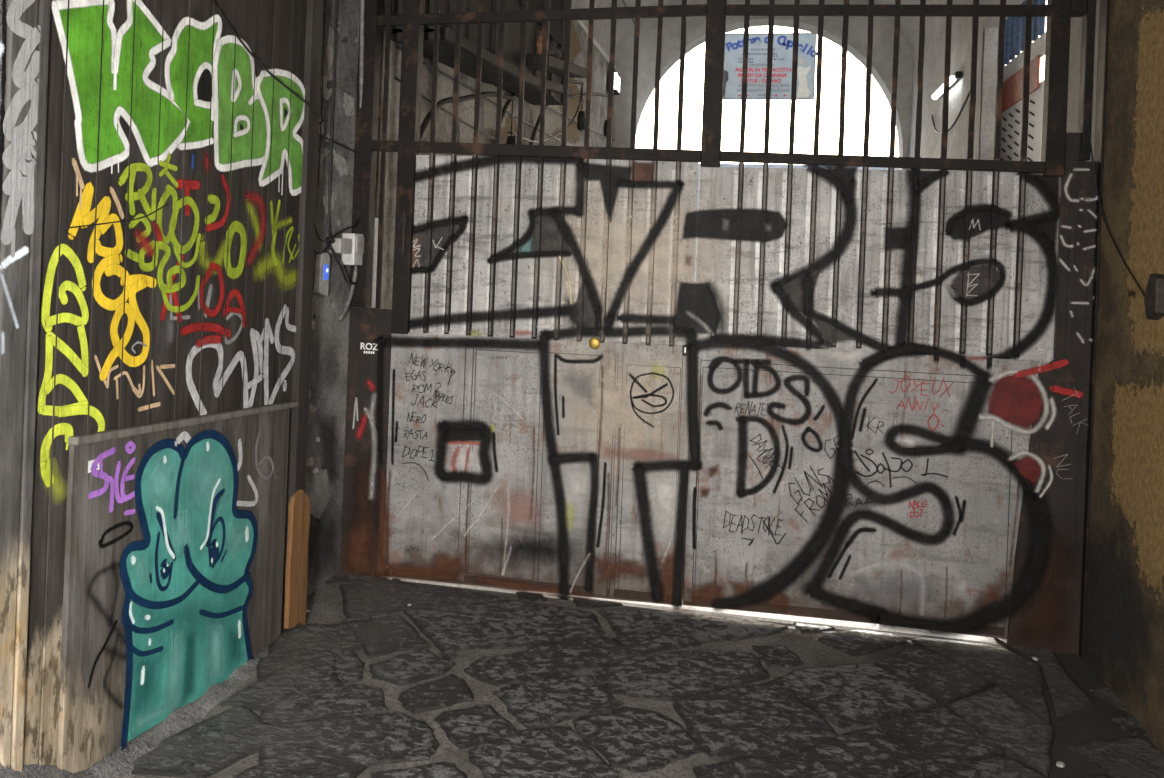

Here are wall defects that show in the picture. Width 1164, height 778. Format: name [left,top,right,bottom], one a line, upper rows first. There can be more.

rust [348,458,588,599]
rust [594,367,645,578]
rust [659,551,751,603]